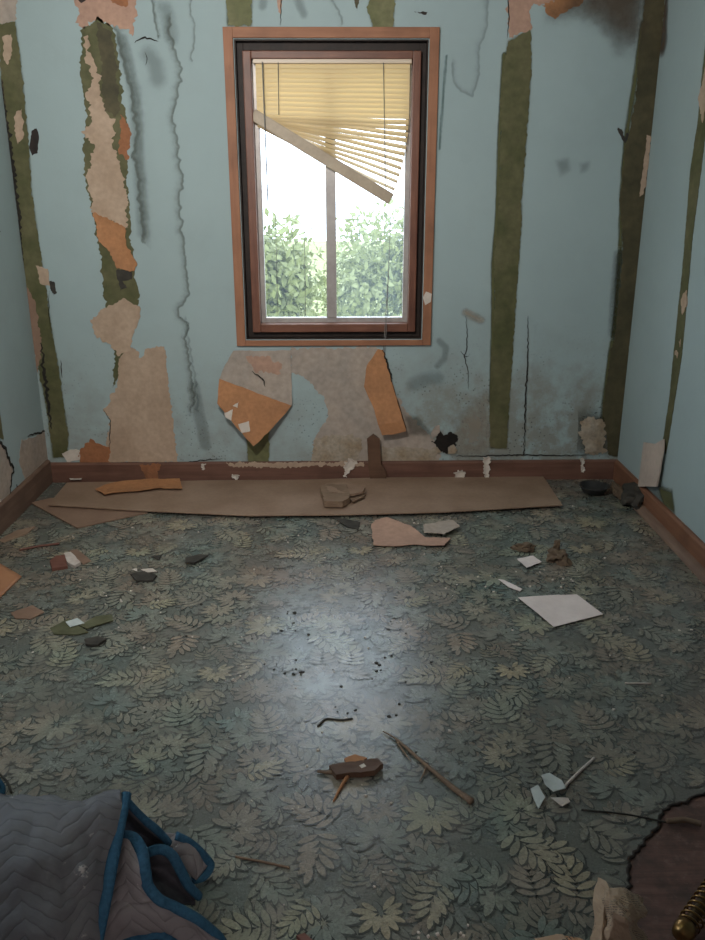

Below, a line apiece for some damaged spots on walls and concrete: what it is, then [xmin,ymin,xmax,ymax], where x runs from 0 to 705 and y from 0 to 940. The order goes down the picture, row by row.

peeling [505,0,583,38]
peeling [62,0,178,462]
peeling [224,346,458,480]
crack [458,319,573,457]